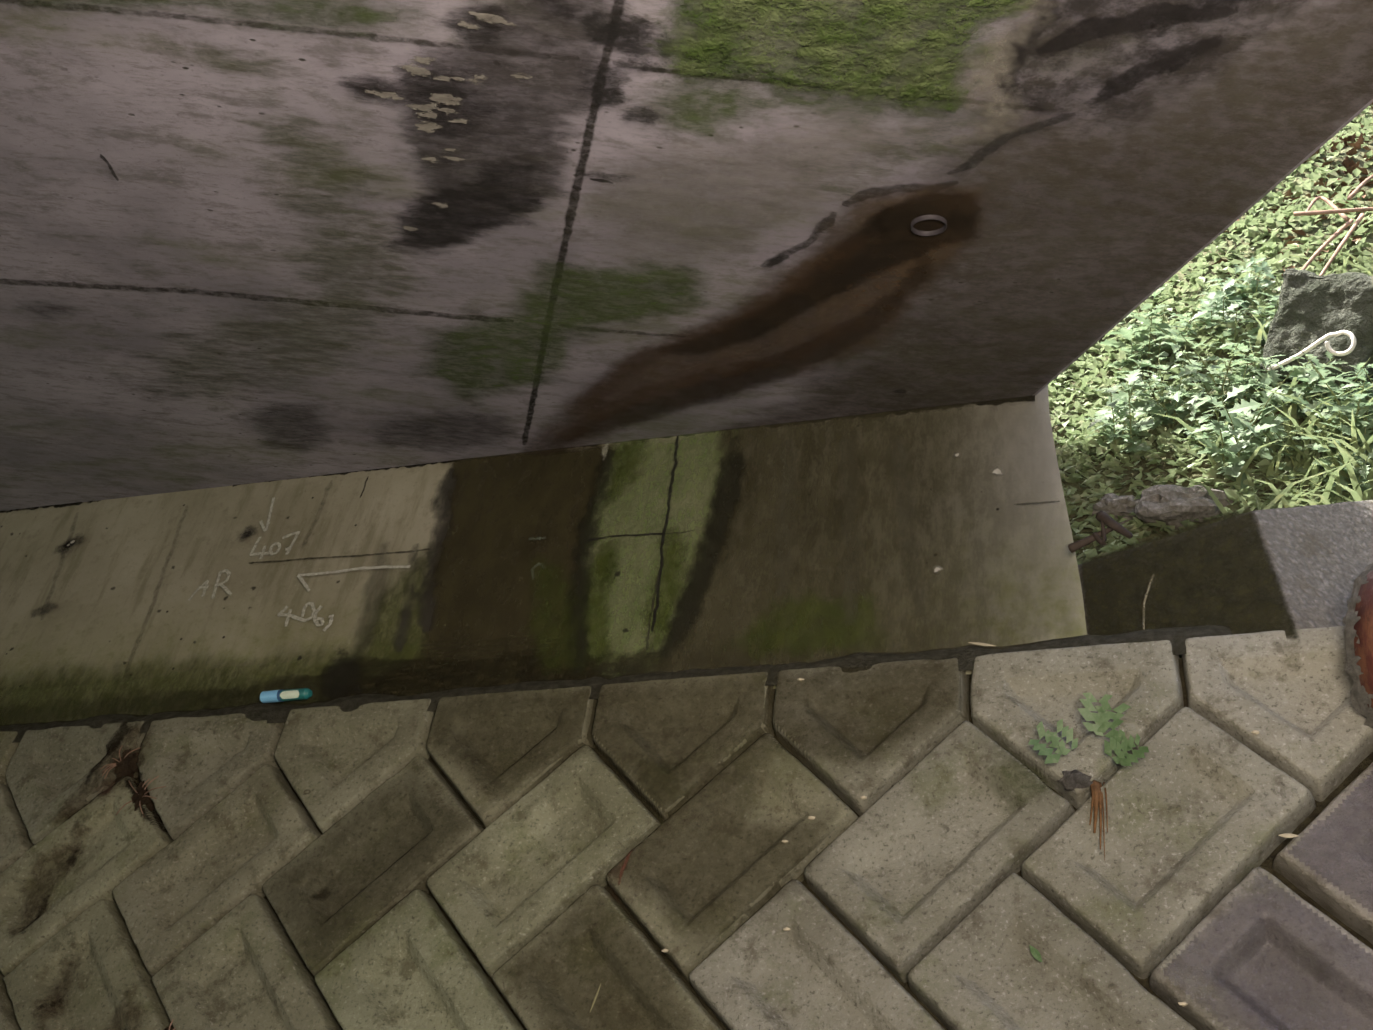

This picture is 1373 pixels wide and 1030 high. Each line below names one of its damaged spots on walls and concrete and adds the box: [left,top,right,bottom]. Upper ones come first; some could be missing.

crack [590,177,613,185]
rust [535,190,979,453]
leakage [190,0,1373,927]